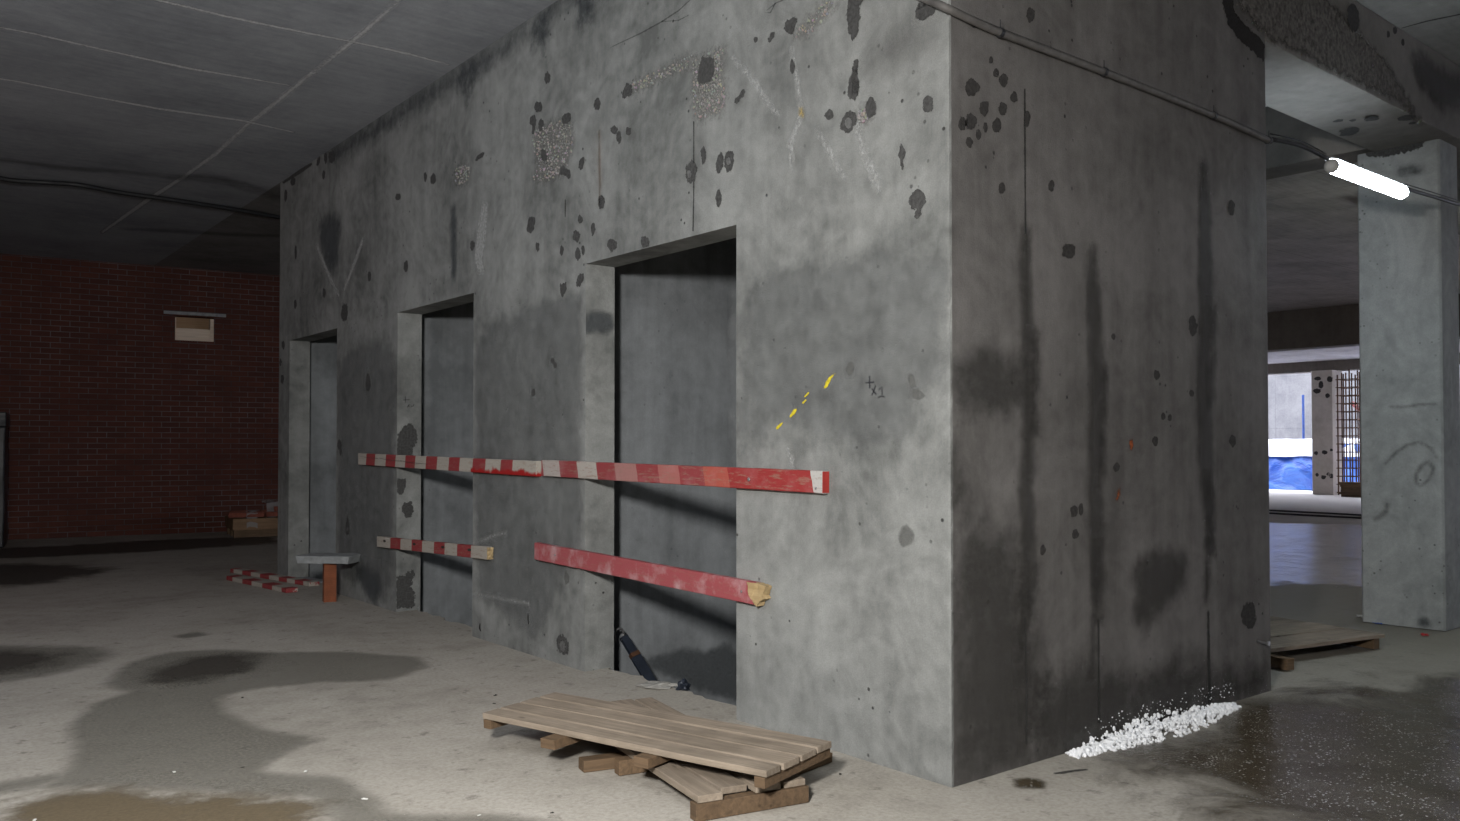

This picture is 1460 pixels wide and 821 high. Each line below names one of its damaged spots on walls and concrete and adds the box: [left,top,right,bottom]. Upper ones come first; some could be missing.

spalling [1222,0,1265,61]
water stain [958,233,1264,773]
water stain [1198,164,1215,597]
water stain [0,633,516,821]